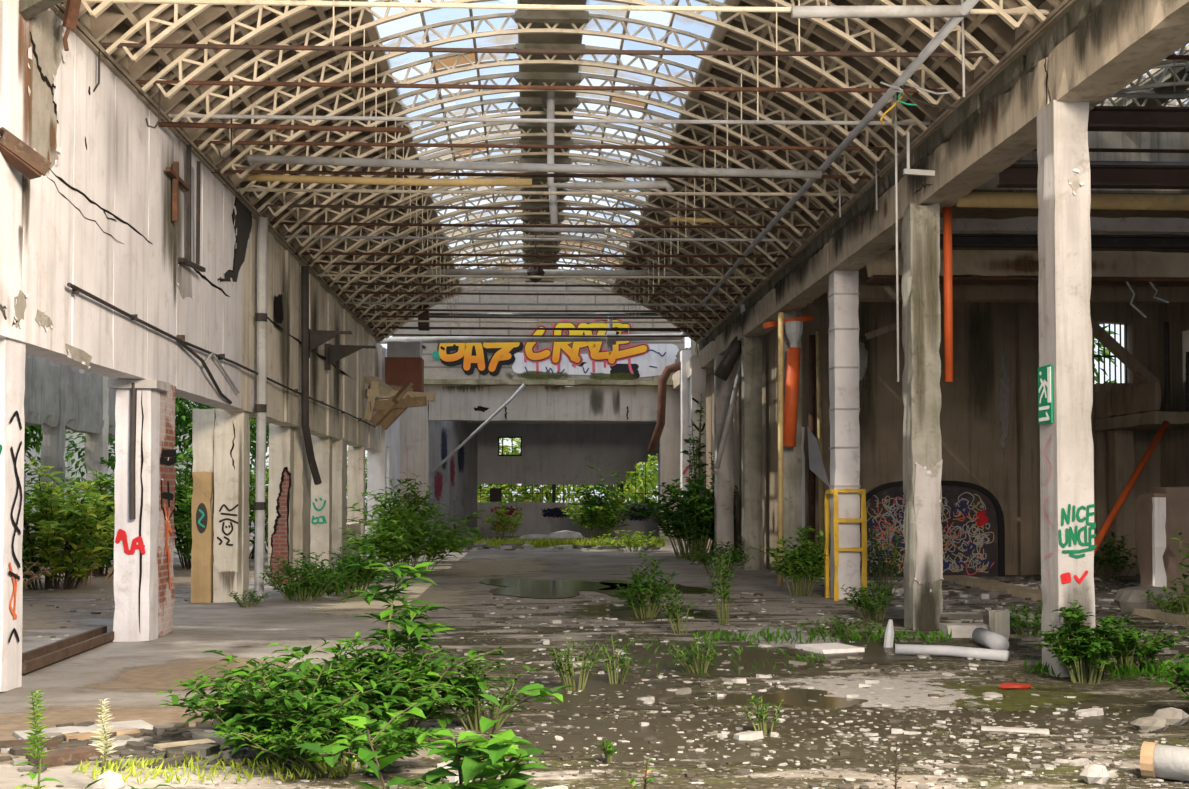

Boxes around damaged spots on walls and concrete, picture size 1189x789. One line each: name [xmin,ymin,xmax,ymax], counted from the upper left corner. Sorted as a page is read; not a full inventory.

spalling [28,9,68,174]
leakage [945,64,1032,150]
leakage [907,150,933,190]
spalling [217,197,252,287]
spalling [11,290,54,331]
spalling [160,458,179,523]
flaking render [270,467,291,584]
leakage [464,566,1189,774]